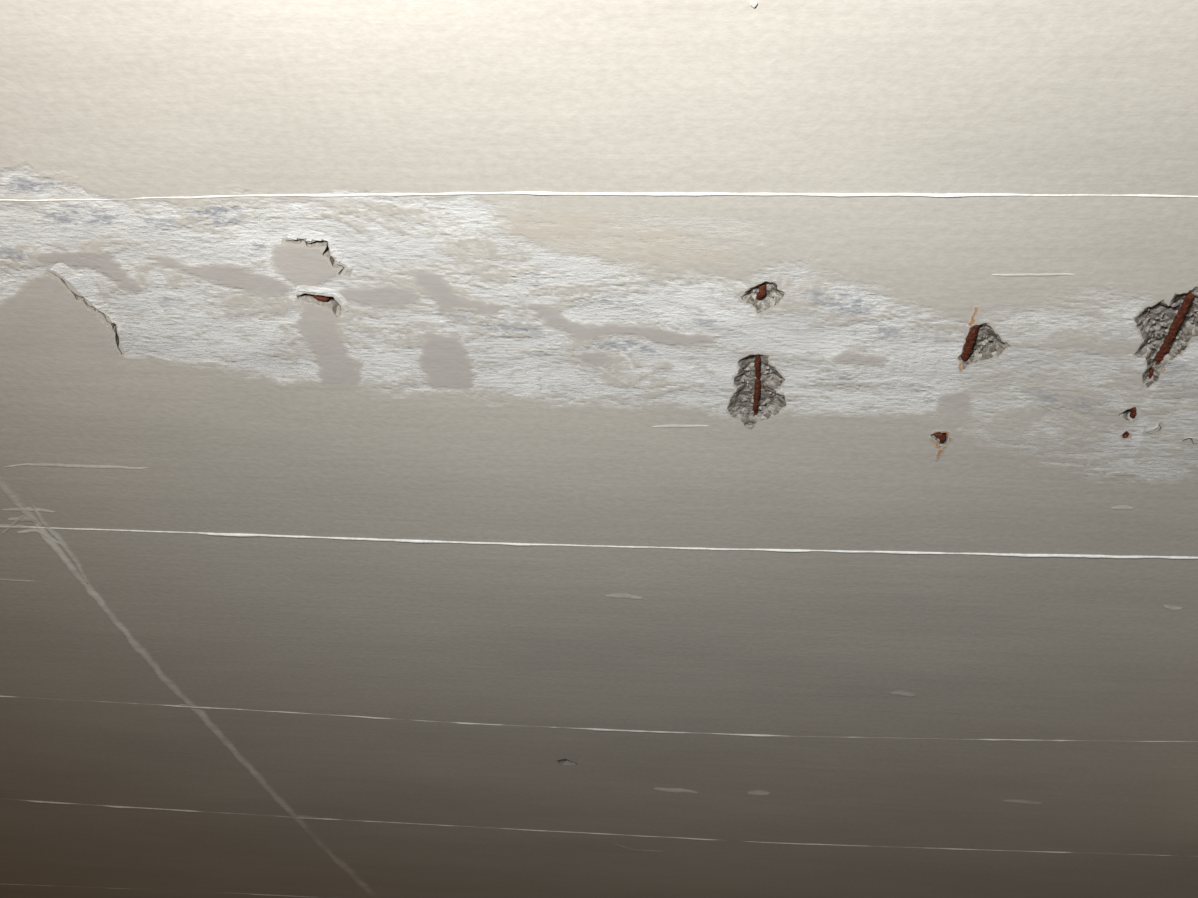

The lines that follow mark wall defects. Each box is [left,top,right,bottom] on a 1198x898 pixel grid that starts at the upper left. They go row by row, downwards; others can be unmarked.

peeling [142,230,503,394]
water stain [0,156,1198,496]
spalling [727,354,786,430]
spalling [741,281,787,313]
spalling [928,306,1011,462]
spalling [1134,286,1198,387]